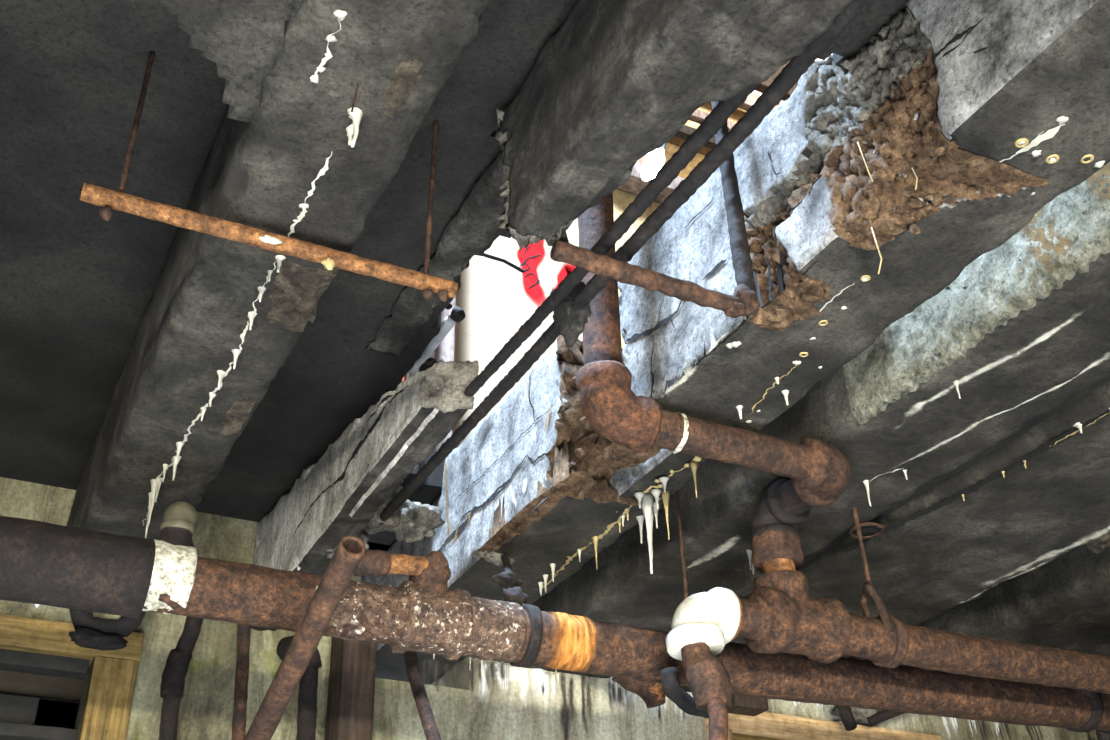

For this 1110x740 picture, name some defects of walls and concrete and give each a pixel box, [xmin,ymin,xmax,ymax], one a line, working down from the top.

leakage [310,10,347,83]
leakage [346,107,363,148]
spalling [490,103,574,251]
leakage [1015,116,1069,164]
leakage [1081,154,1105,168]
leakage [143,151,332,538]
spalling [380,267,664,567]
leakage [708,332,742,352]
leakage [736,320,828,423]
leakage [863,360,1110,507]
leakage [909,319,1072,413]
leakage [538,456,702,595]